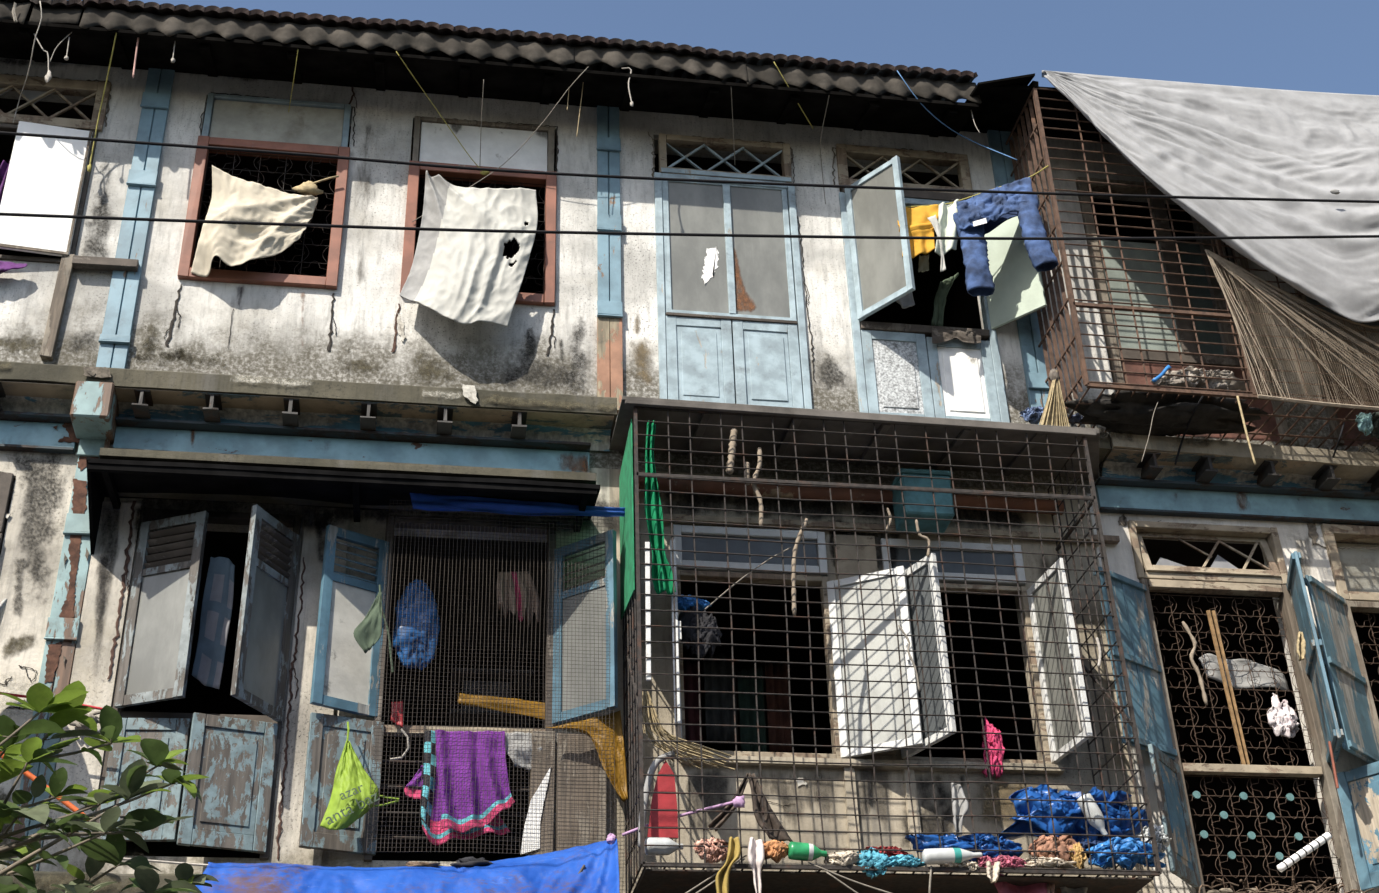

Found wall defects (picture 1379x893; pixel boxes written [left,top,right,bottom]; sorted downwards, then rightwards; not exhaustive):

crack [164,284,182,346]
crack [327,293,337,351]
water stain [504,321,585,391]
water stain [14,453,61,612]
crack [107,501,136,679]
water stain [4,636,34,656]
peeling [44,642,66,683]
crack [276,557,306,859]